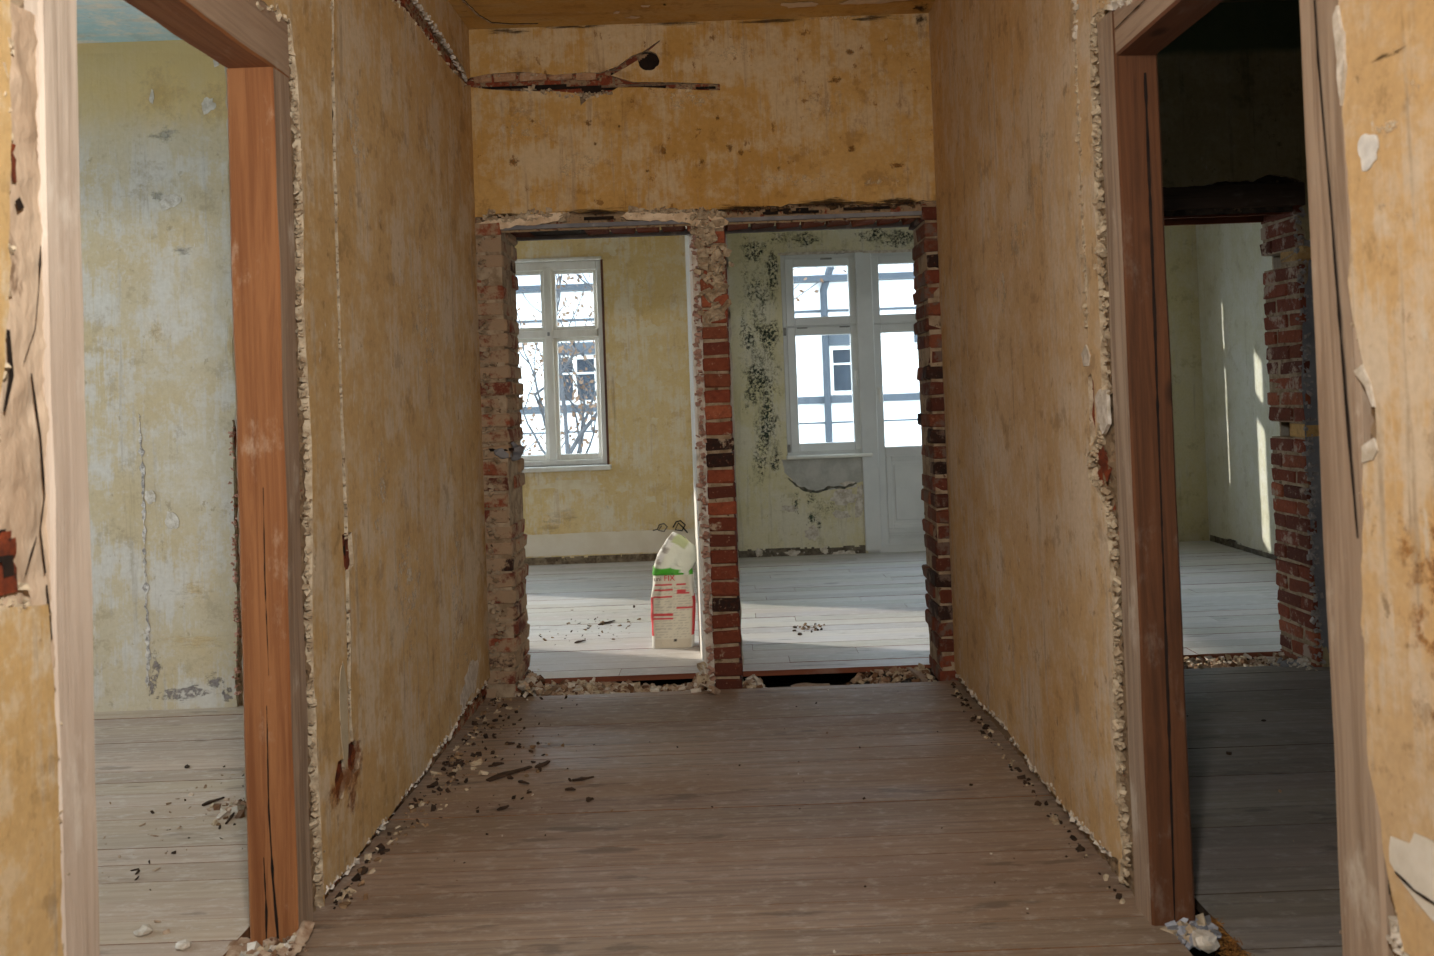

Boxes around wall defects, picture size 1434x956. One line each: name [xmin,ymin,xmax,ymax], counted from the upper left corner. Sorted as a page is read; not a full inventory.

spalling [639,52,659,70]
spalling [1332,6,1347,106]
peeling [1358,133,1379,171]
spalling [0,2,62,725]
leakage [741,232,817,474]
peeling [782,457,863,519]
spalling [955,0,1135,896]
spalling [1350,323,1378,463]
peeling [1381,833,1434,956]